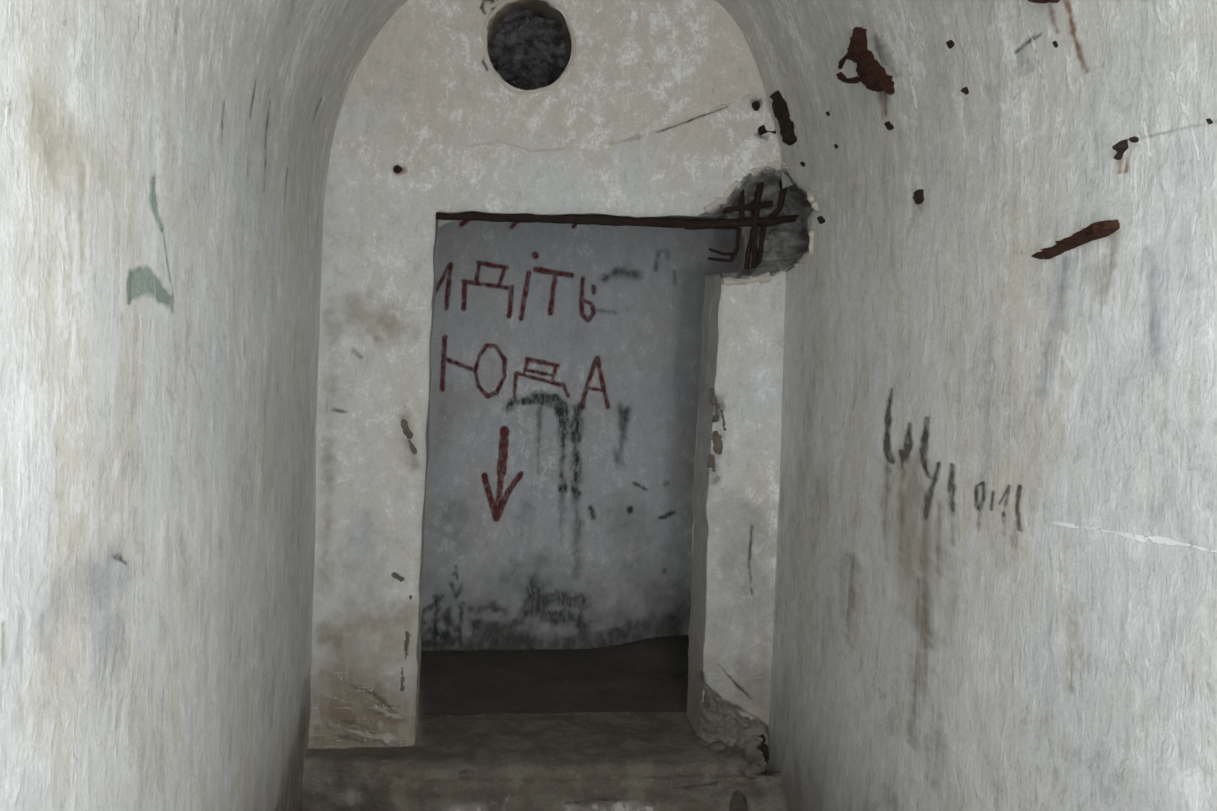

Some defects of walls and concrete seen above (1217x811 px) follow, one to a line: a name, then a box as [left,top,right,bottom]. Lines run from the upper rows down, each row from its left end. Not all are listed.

rust [1027,0,1082,59]
rust [836,26,895,113]
rust [770,91,797,146]
spalling [684,160,825,286]
rust [1031,220,1120,260]
leakage [506,393,581,495]
crack [1053,521,1217,553]
leakage [420,574,680,651]